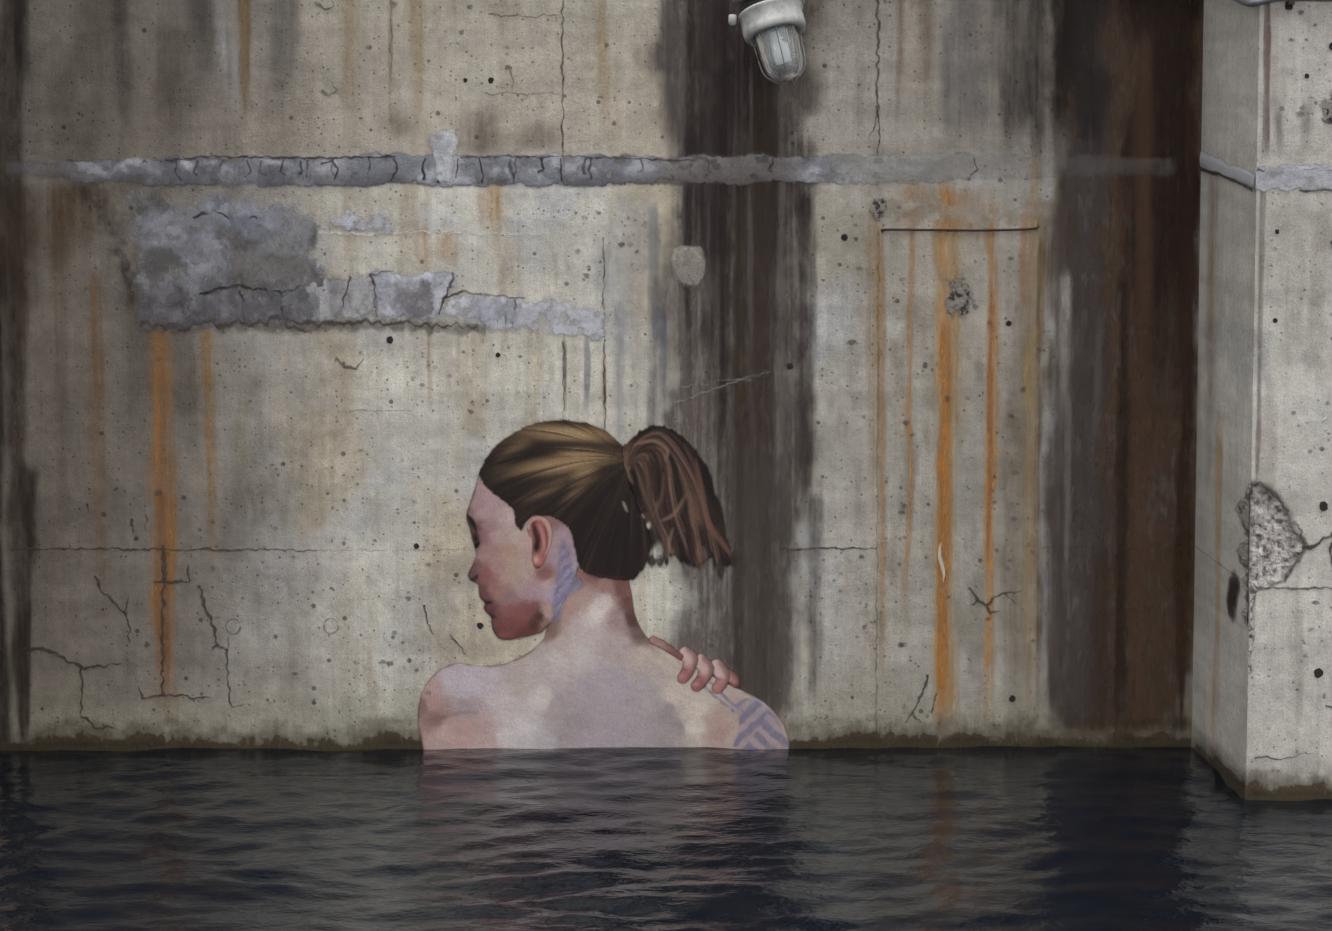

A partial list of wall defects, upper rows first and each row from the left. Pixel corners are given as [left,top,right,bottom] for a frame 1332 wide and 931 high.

water stain [653,0,818,158]
crack [24,515,244,730]
water stain [649,179,819,716]
corrosion [934,190,959,704]
corrosion [984,210,998,668]
crack [968,587,1022,614]
water stain [998,0,1204,732]
spalling [1226,481,1306,673]
crack [1302,533,1332,565]